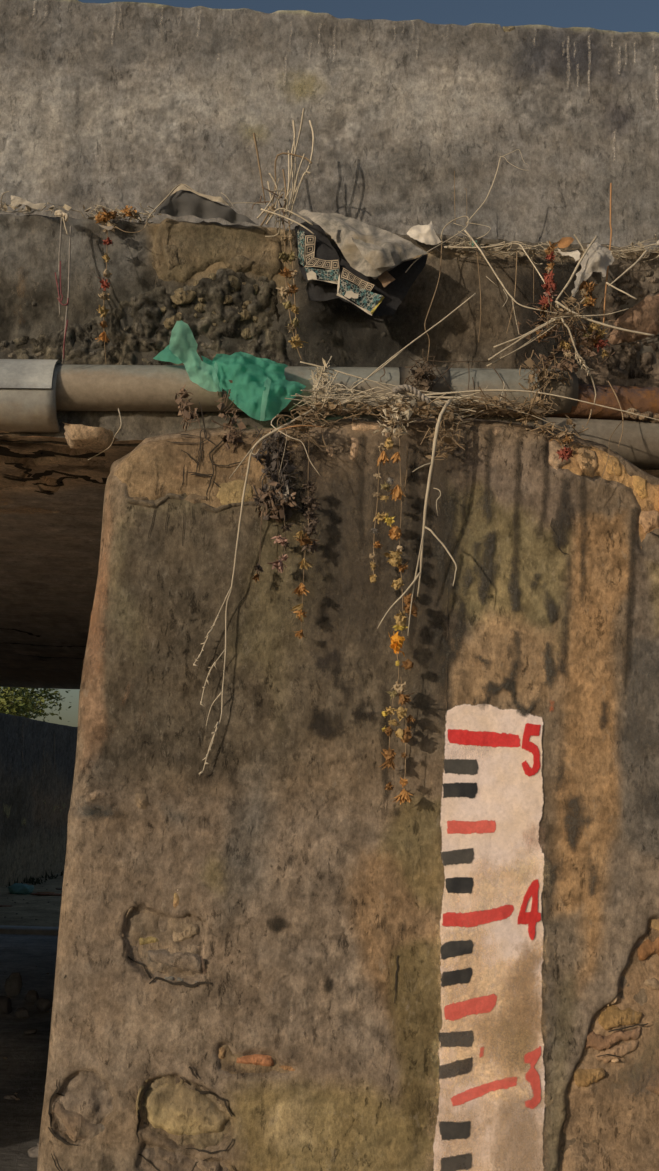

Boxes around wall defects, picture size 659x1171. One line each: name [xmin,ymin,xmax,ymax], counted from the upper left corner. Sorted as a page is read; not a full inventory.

peeling [0,422,270,514]
leakage [298,429,497,688]
leakage [508,441,567,686]
leakage [540,443,586,596]
peeling [548,436,659,542]
leakage [624,508,659,685]
leakage [315,650,388,798]
leakage [480,631,535,716]
spalling [122,889,207,977]
spalling [52,1071,113,1141]
spalling [136,1075,231,1171]
spalling [559,918,659,1171]